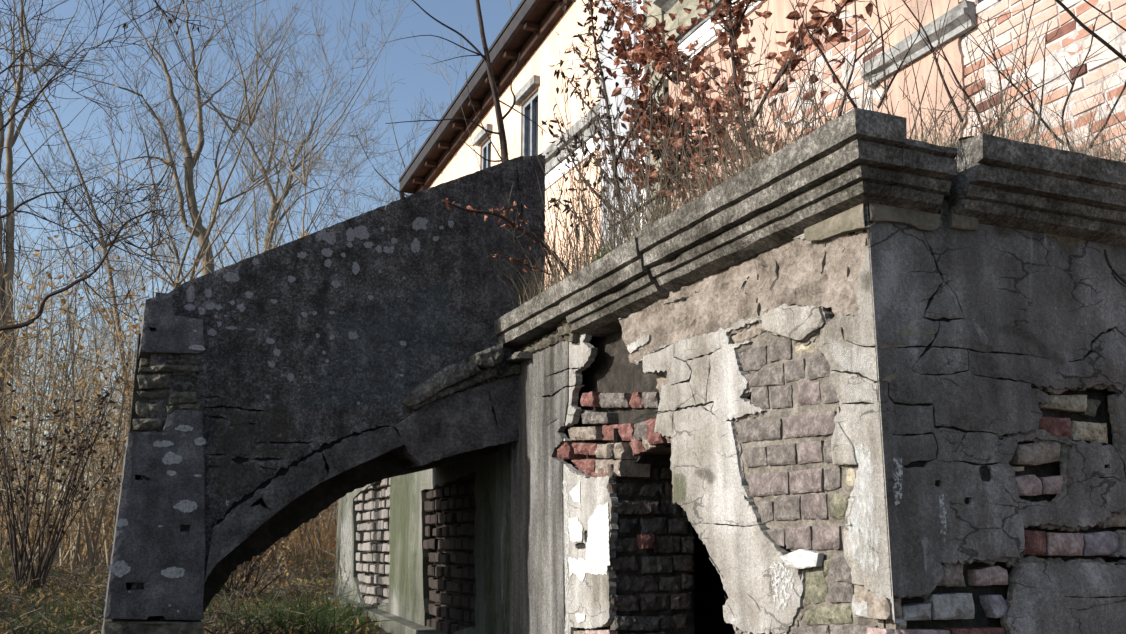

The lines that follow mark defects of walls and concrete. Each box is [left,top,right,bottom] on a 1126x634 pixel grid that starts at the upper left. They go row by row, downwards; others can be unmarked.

flaking render [959,0,1126,162]
crack [821,222,875,277]
crack [741,263,778,316]
spalling [130,358,201,432]
crack [205,396,389,527]
spalling [557,374,672,503]
flaking render [619,230,1126,634]
crack [833,249,1027,468]
crack [1070,328,1113,362]
peeling [568,503,610,582]
flaking render [573,613,621,634]
crack [1064,593,1126,601]